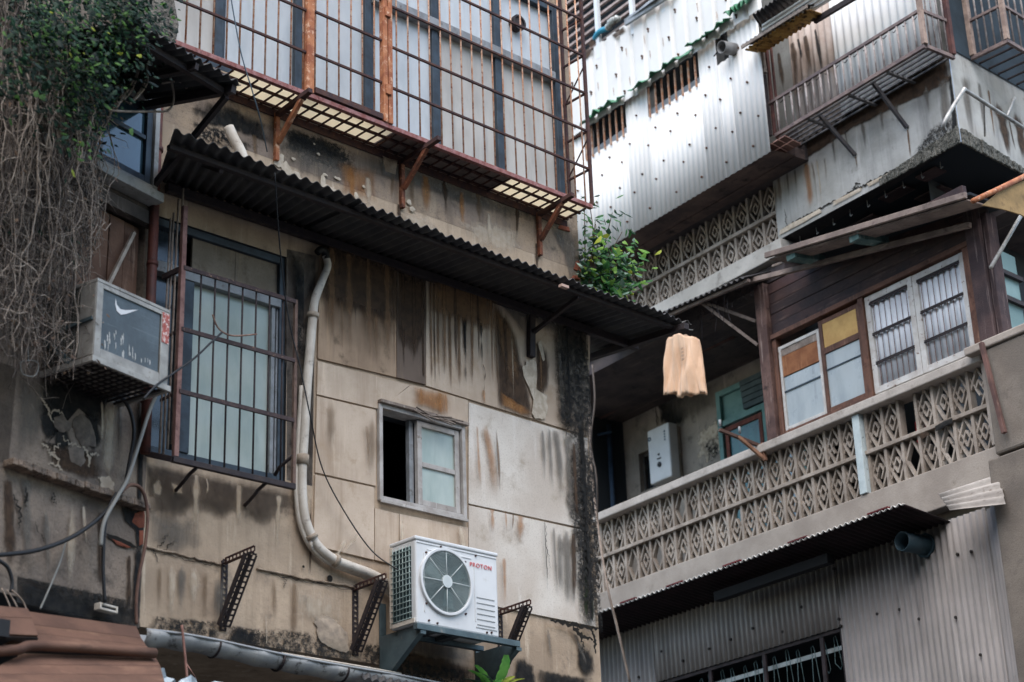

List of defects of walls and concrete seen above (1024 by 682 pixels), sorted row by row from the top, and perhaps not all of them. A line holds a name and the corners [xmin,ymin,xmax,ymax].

mould [194,105,264,151]
leakage [286,131,355,175]
peeling [495,306,549,419]
rust [418,388,447,410]
peeling [41,435,100,471]
leakage [323,245,603,626]
rust [477,429,500,480]
leakage [5,480,31,559]
leakage [68,507,86,563]
leakage [138,449,287,548]
leakage [154,570,380,664]